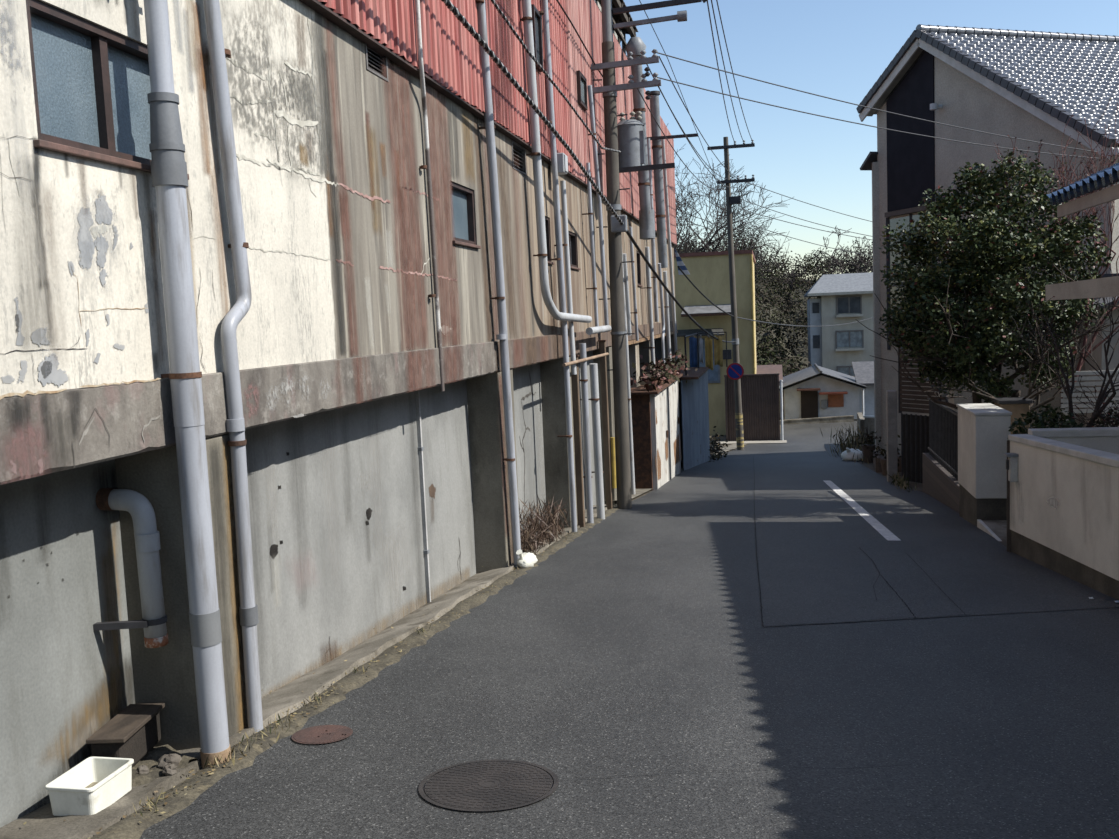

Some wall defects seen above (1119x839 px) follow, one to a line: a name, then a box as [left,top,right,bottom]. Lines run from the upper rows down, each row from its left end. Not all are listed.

damp [230,23,331,173]
peeling [68,194,133,287]
crack [267,158,439,203]
rust [367,57,460,392]
peeling [1,298,68,387]
rust [96,488,118,511]
damp [58,663,136,777]